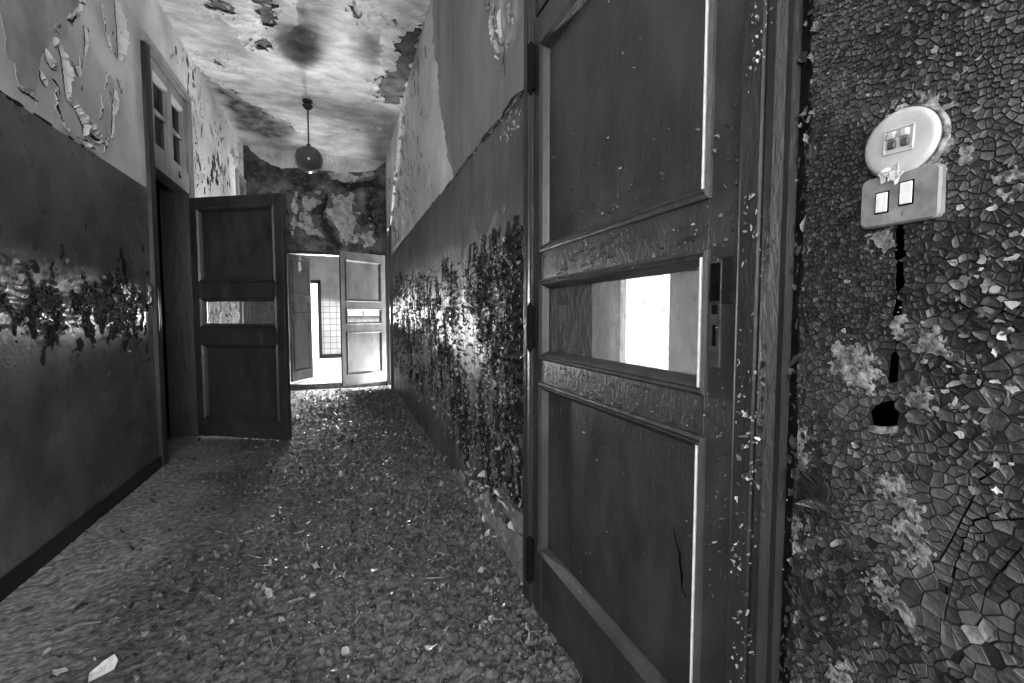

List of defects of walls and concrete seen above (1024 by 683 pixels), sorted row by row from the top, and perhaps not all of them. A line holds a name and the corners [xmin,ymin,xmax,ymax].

peeling [0,0,130,154]
water stain [292,9,318,53]
peeling [733,0,774,109]
peeling [880,49,938,96]
peeling [951,52,982,93]
peeling [970,10,997,33]
peeling [651,180,773,269]
peeling [0,245,153,366]
peeling [157,0,636,585]
spalling [778,0,889,683]
spalling [841,400,911,499]
peeling [729,609,754,683]